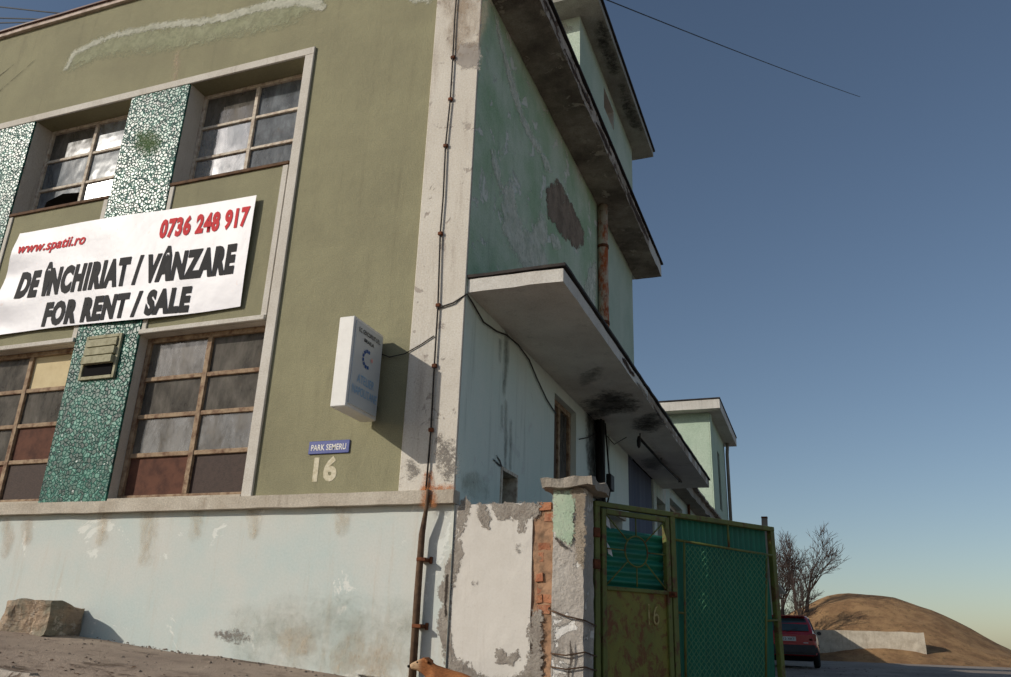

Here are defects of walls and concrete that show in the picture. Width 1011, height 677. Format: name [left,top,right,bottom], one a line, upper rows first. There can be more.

peeling [491,150,585,268]
damp [584,391,660,476]
spalling [436,487,587,677]